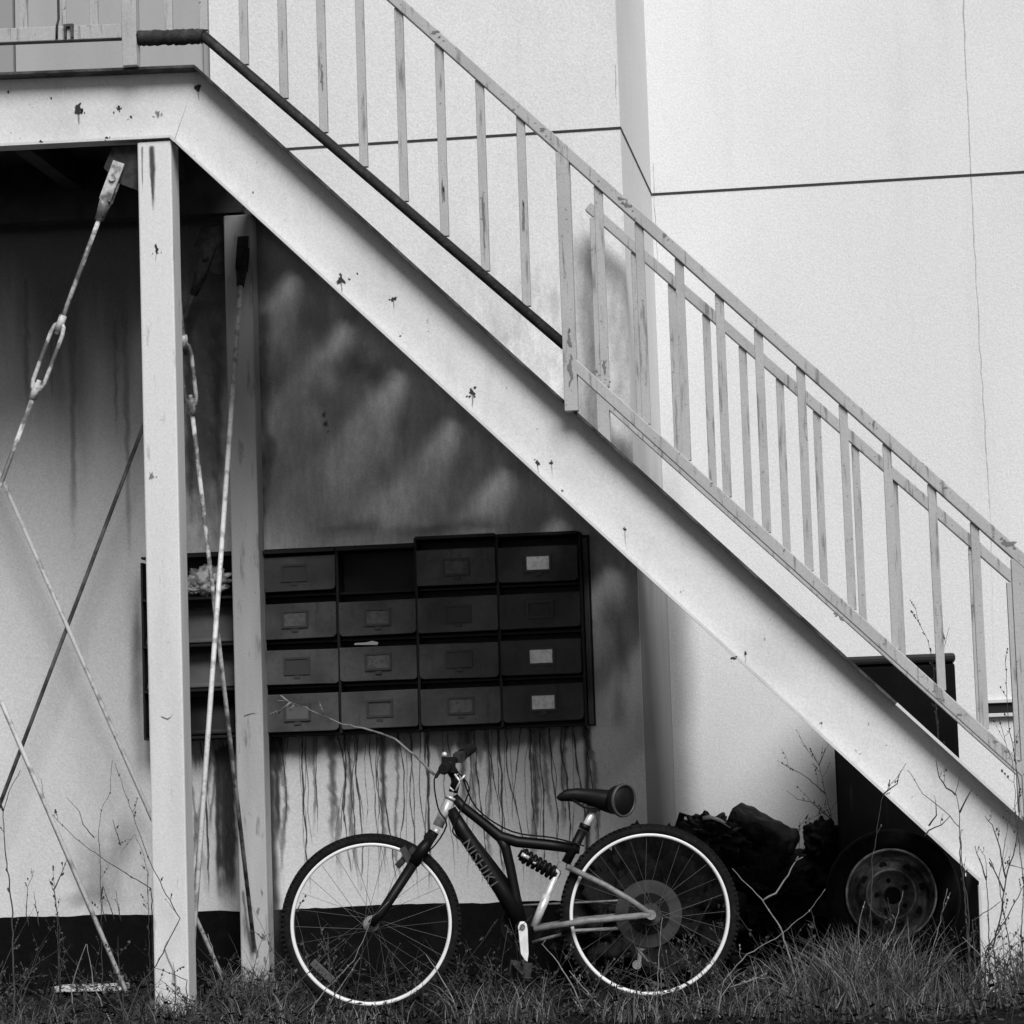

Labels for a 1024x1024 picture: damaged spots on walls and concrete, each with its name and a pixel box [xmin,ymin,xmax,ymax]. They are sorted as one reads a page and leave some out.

leakage [195,742,237,885]
leakage [336,734,430,842]
leakage [467,727,599,860]